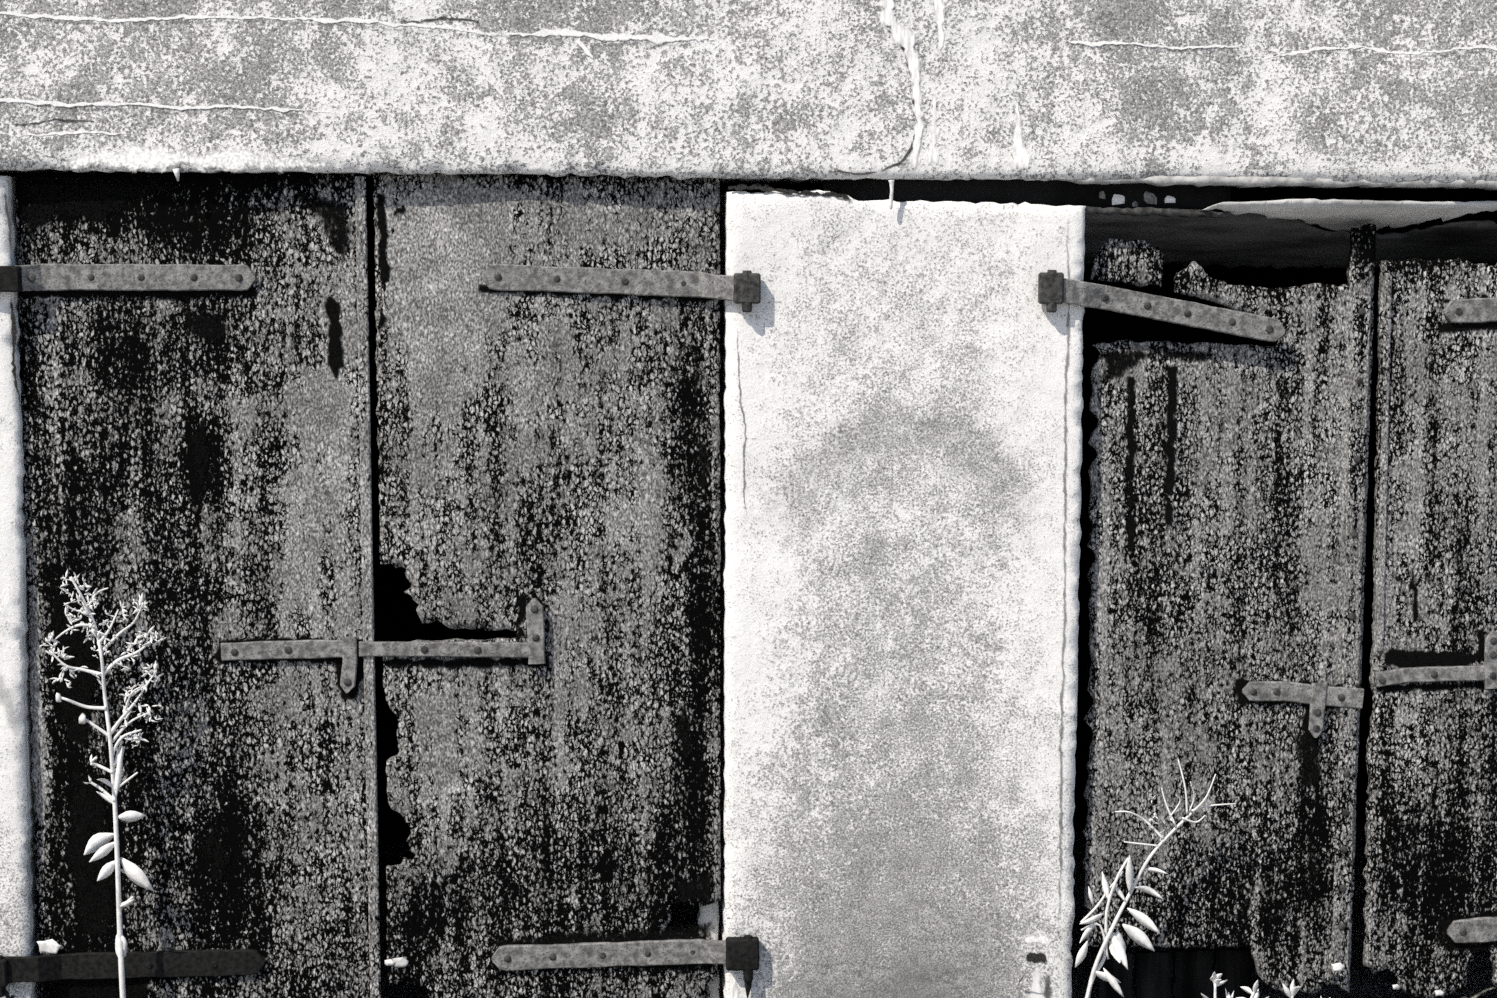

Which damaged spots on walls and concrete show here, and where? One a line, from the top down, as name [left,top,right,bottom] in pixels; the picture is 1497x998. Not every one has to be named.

crack [0,11,715,58]
crack [0,98,325,137]
corrosion [20,287,258,344]
corrosion [325,295,344,379]
corrosion [1100,347,1213,552]
corrosion [51,576,101,749]
corrosion [214,635,364,700]
corrosion [386,657,549,669]
corrosion [1359,630,1485,693]
corrosion [57,770,116,954]
corrosion [493,922,713,949]
corrosion [50,977,201,998]